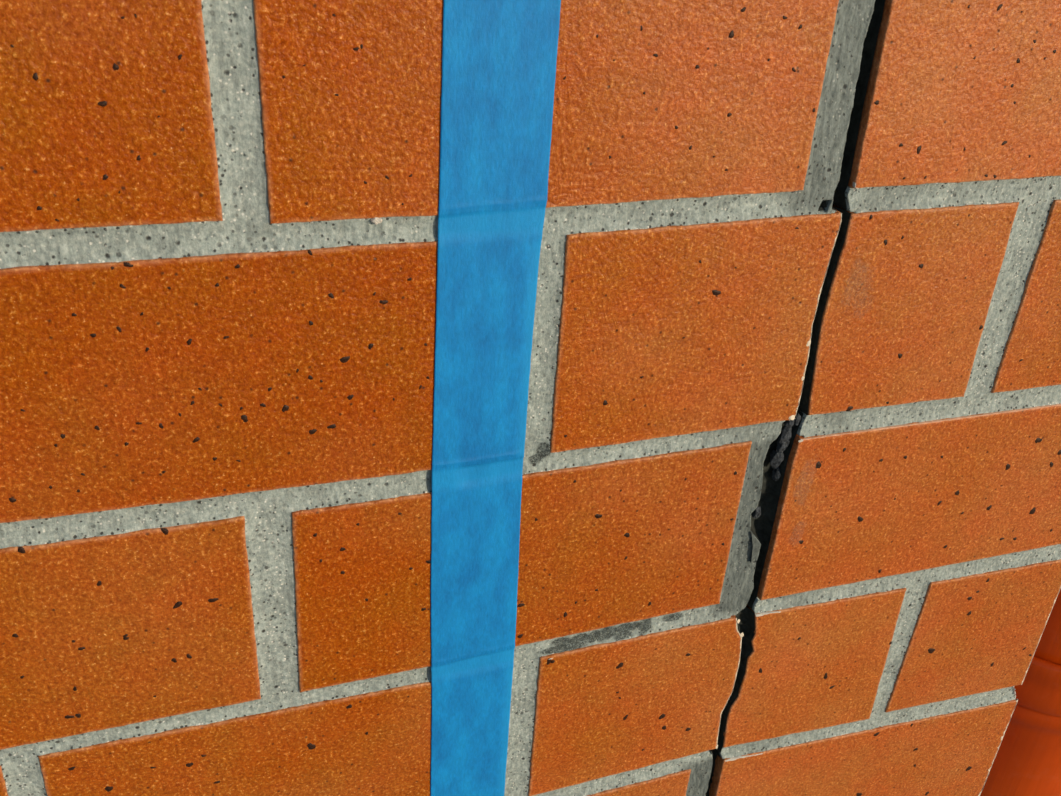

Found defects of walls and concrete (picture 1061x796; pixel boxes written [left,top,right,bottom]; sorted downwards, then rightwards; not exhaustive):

crack [706,0,885,796]